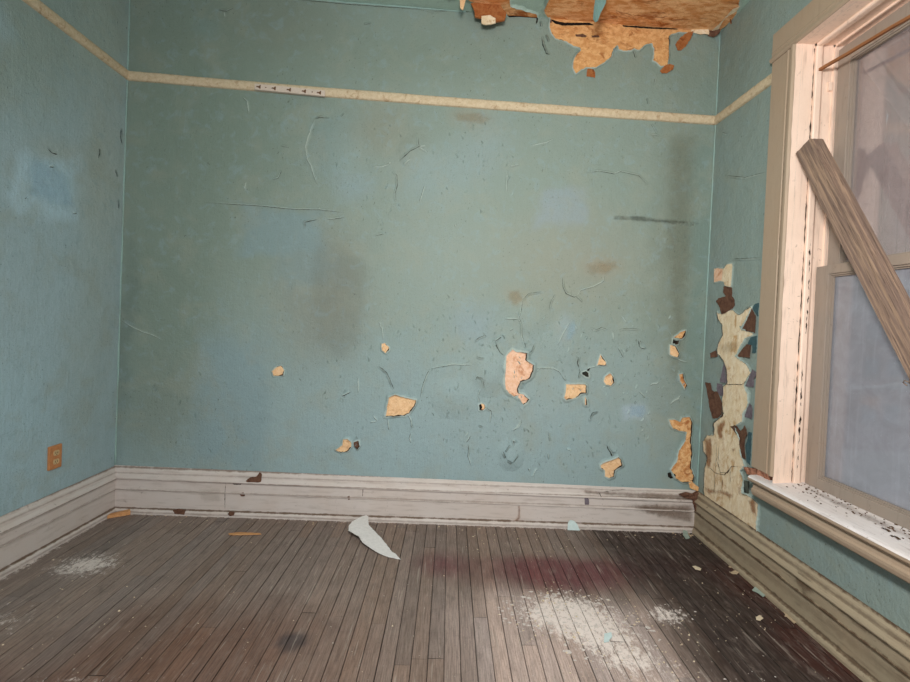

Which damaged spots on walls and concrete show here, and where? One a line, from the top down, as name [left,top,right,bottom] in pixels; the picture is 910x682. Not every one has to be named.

flaking render [550,19,693,73]
flaking render [648,328,688,391]
flaking render [378,311,659,481]
flaking render [325,431,362,454]
flaking render [744,467,773,480]